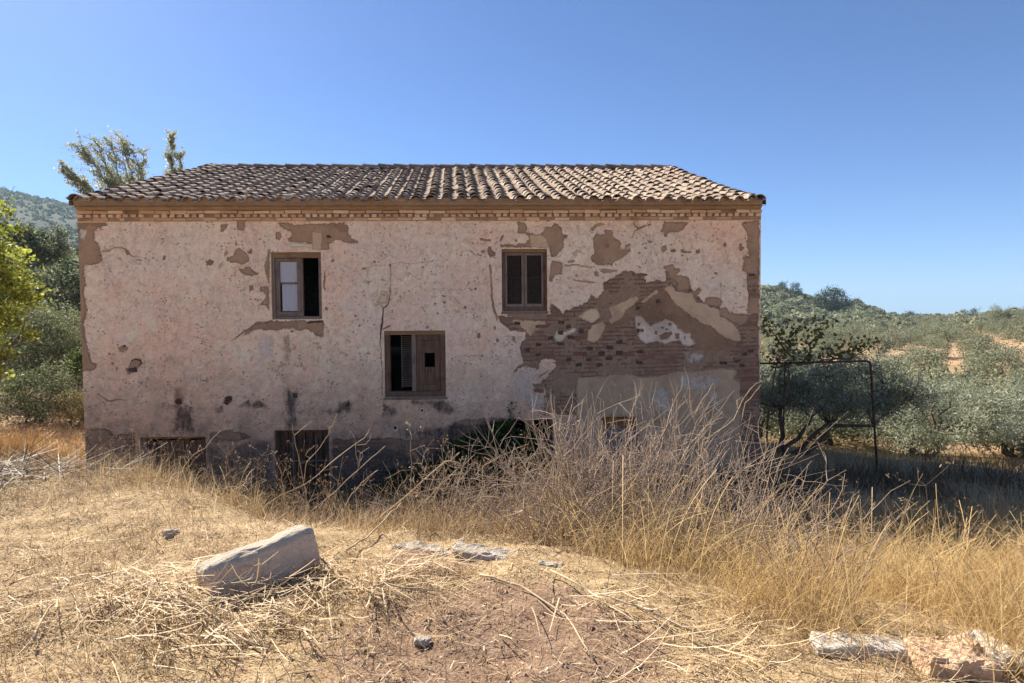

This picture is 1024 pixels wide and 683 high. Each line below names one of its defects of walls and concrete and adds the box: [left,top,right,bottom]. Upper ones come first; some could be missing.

peeling [78,223,107,372]
flaking render [108,346,142,375]
peeling [205,221,358,341]
crack [352,260,434,395]
flaking render [480,220,761,482]
water stain [85,427,136,477]
water stain [210,429,271,491]
water stain [286,391,297,427]
water stain [331,400,512,490]